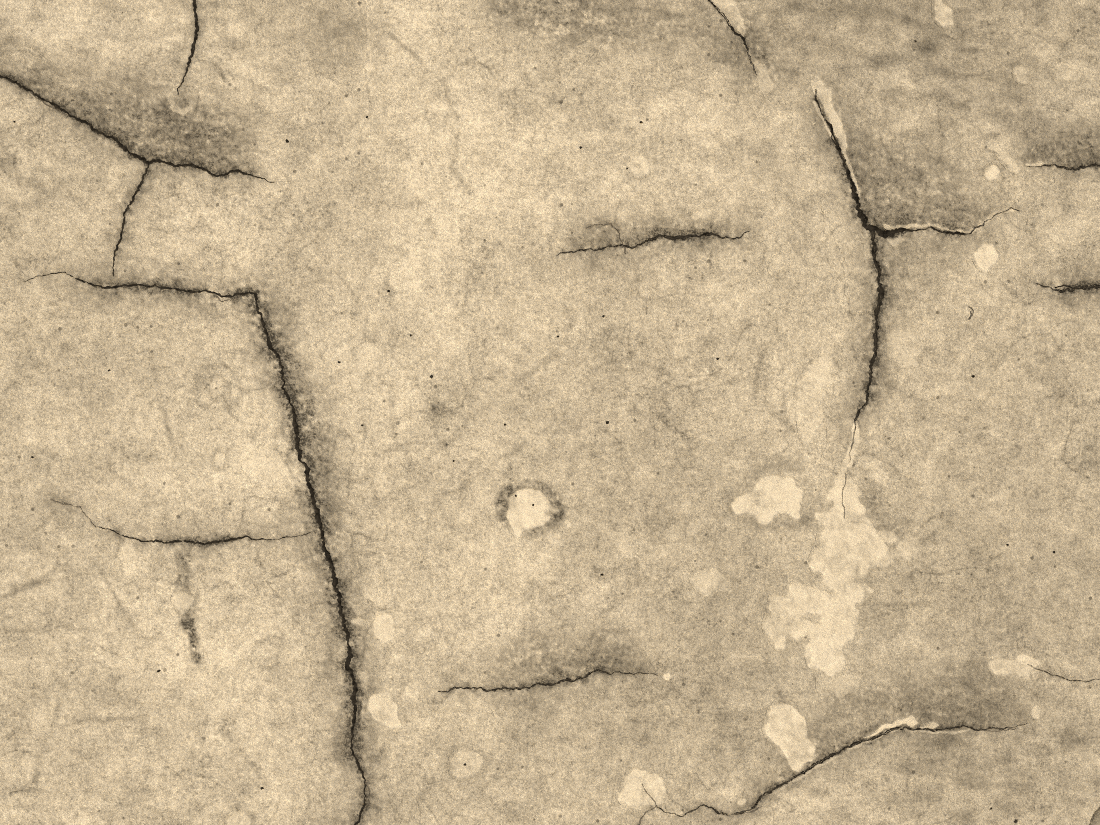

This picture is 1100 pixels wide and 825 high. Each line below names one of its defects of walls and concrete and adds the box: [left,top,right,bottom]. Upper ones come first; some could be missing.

crack [535,203,768,276]
crack [693,0,1100,518]
crack [0,0,671,825]
spalling [504,484,572,538]
spalling [729,460,924,700]
spalling [762,699,819,774]
crack [623,706,1042,825]